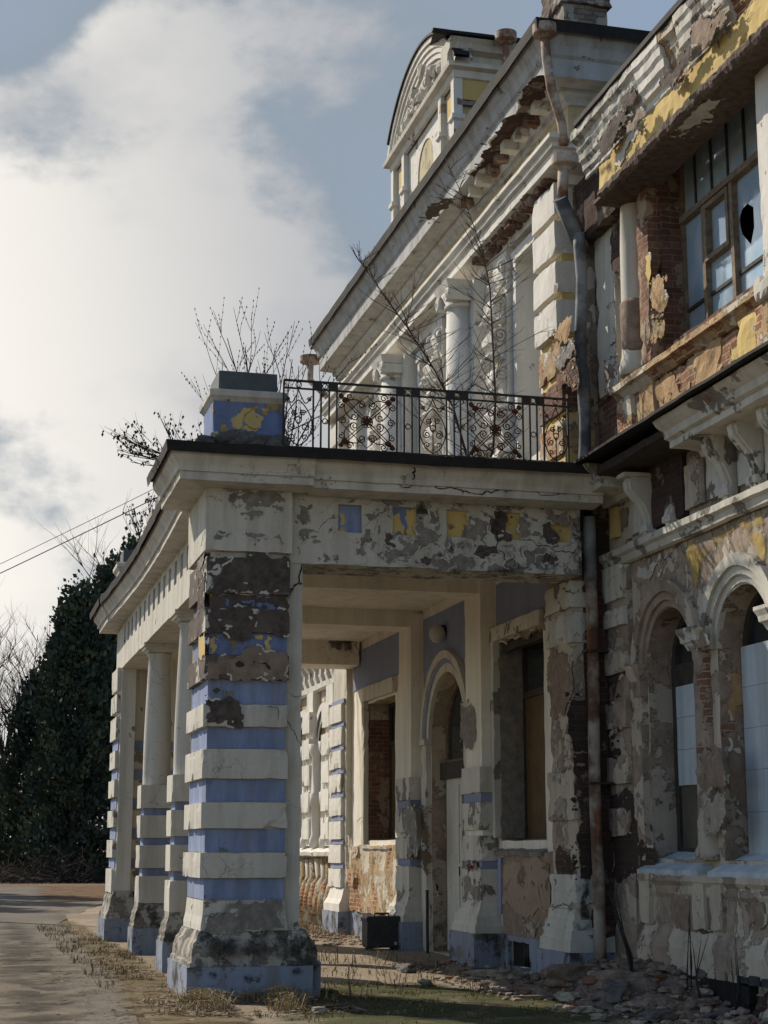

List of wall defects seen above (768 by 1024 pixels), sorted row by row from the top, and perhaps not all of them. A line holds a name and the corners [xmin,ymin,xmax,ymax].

flaking render [659,2,727,92]
flaking render [466,75,547,180]
flaking render [418,198,456,224]
flaking render [645,252,669,344]
flaking render [551,315,579,403]
crack [377,467,507,496]
flaking render [195,488,291,729]
crack [290,565,302,595]
peeling [332,498,571,570]
flaking render [546,646,592,882]
flaking render [700,672,750,836]
flaking render [611,788,655,883]